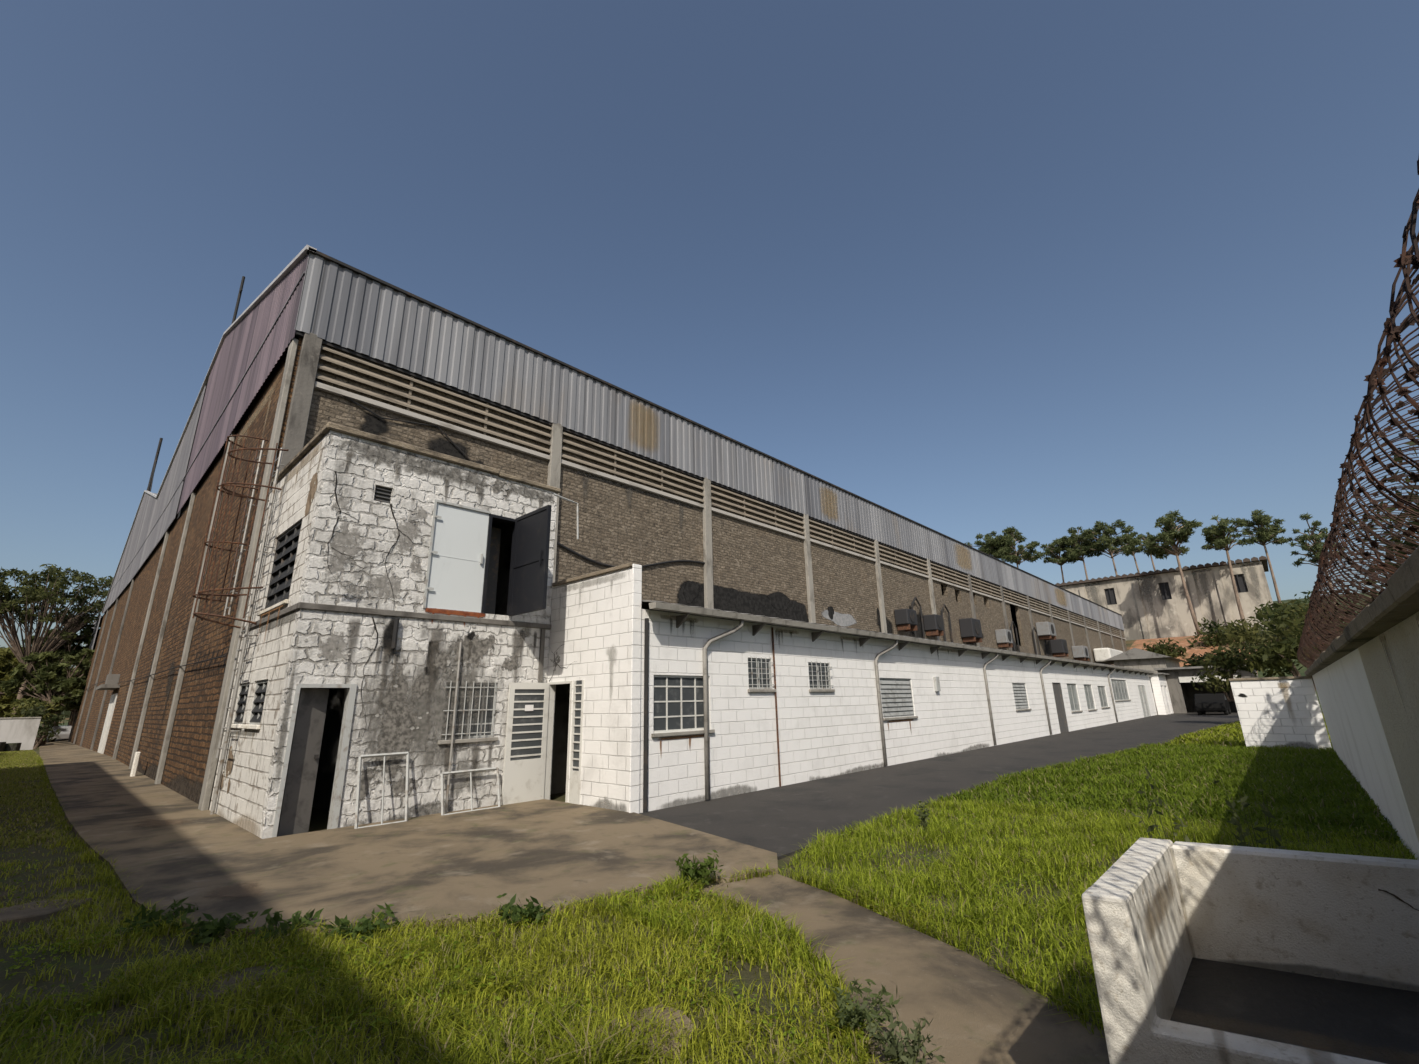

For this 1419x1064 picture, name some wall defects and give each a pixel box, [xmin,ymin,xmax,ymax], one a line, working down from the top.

peeling [305,469,319,517]
spalling [491,478,508,495]
peeling [322,498,427,605]
peeling [304,627,351,668]
peeling [356,624,519,801]